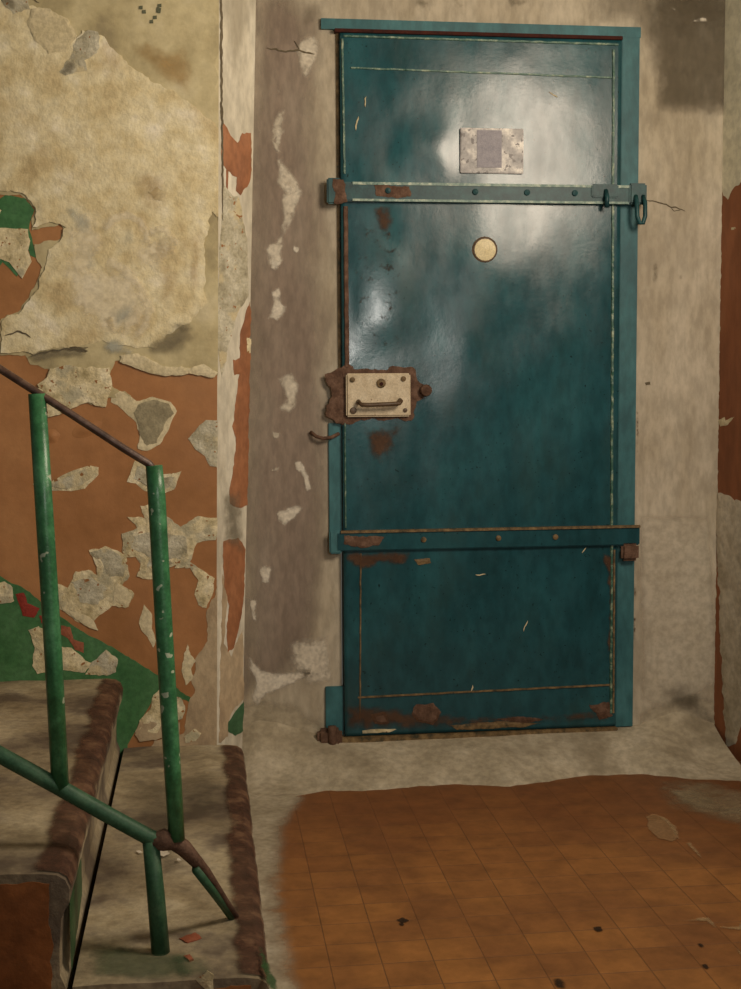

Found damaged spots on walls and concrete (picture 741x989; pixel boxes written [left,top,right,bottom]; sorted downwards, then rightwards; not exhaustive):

flaking render [0,0,252,508]
rust [342,366,424,455]
flaking render [0,581,45,674]
peeling [58,505,152,676]
peeling [139,605,156,647]
flaking render [167,516,246,746]
flaking render [135,690,162,746]
rust [350,703,458,728]
peeling [196,970,214,989]
peeling [260,953,277,989]